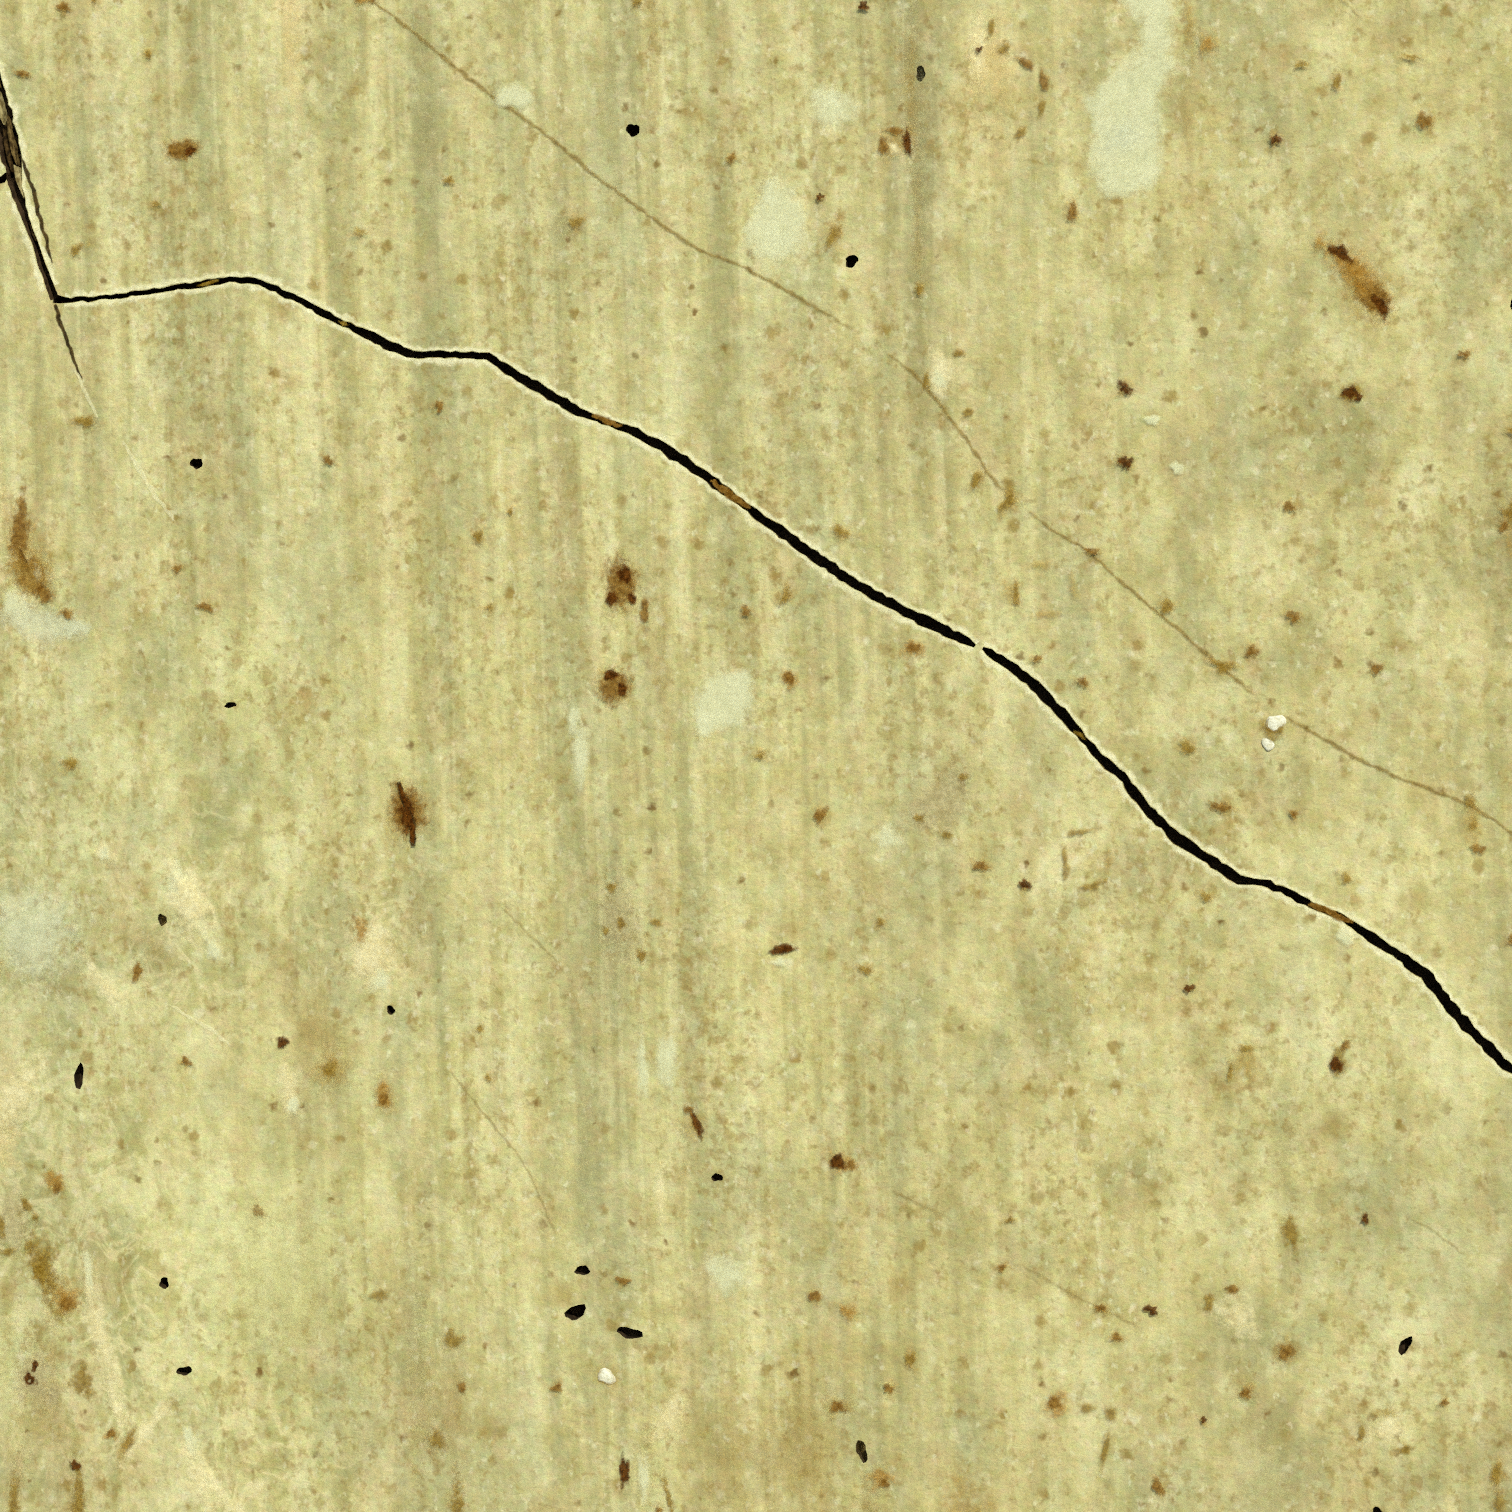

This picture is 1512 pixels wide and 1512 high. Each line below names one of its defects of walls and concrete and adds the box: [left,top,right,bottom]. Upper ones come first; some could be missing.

crack [379,6,828,315]
corrosion [1317,241,1392,319]
corrosion [8,486,71,619]
corrosion [605,559,649,621]
crack [0,64,1512,1077]
corrosion [600,669,634,707]
corrosion [390,781,427,846]